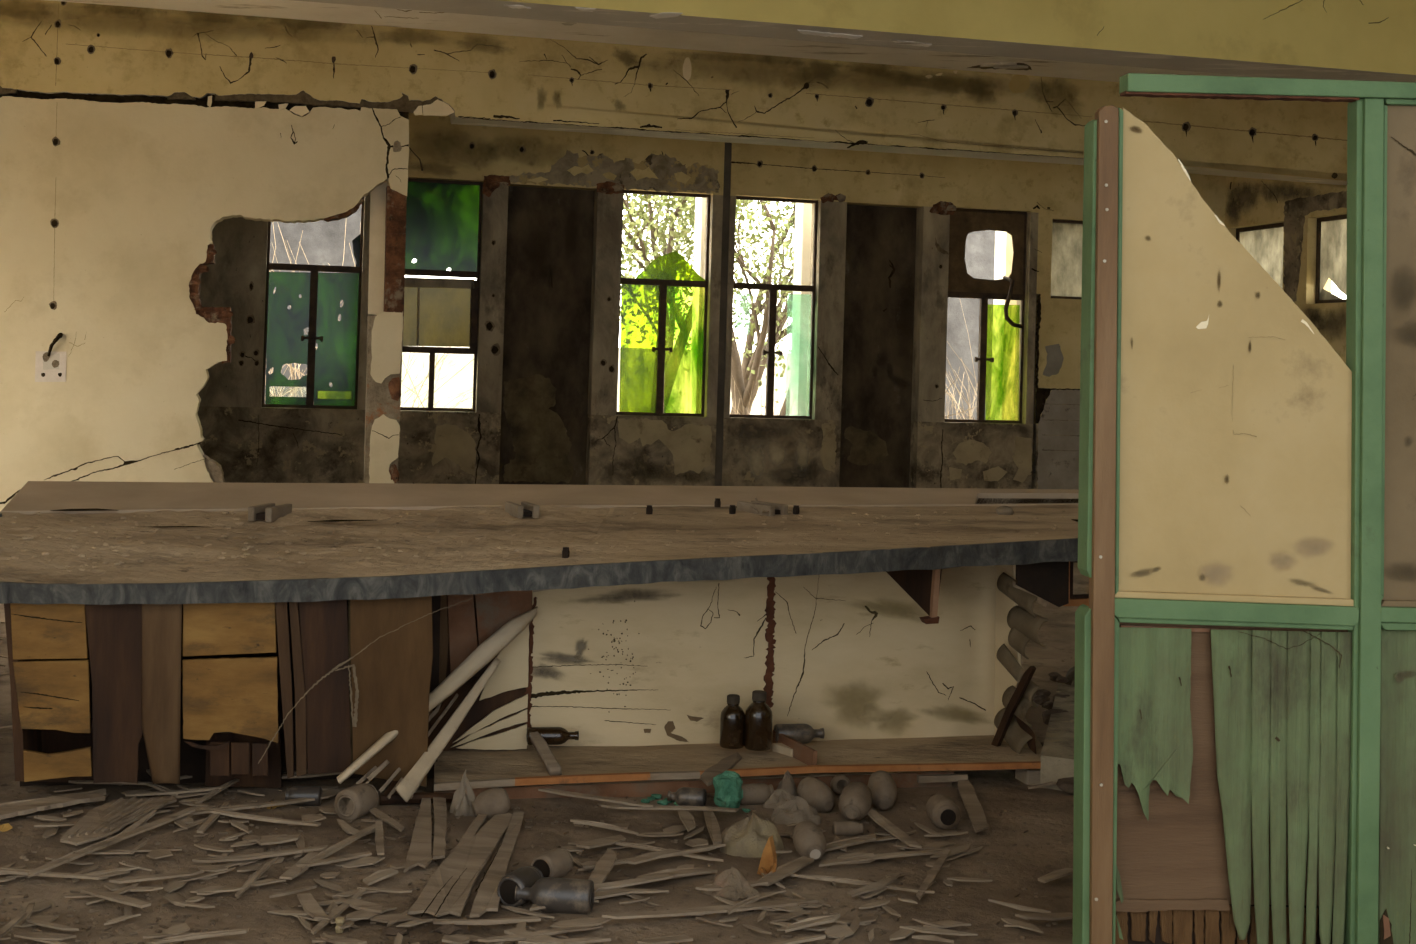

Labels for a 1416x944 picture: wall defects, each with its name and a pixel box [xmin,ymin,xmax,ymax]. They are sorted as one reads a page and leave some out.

crack [0,4,498,181]
crack [806,79,1089,153]
crack [662,130,945,178]
spalling [324,199,363,222]
spalling [189,244,260,366]
peeling [370,312,403,383]
crack [0,442,204,504]
spalling [203,454,225,483]
peeling [369,414,400,483]
peeling [618,418,712,475]
crack [746,578,845,716]
crack [926,671,986,711]